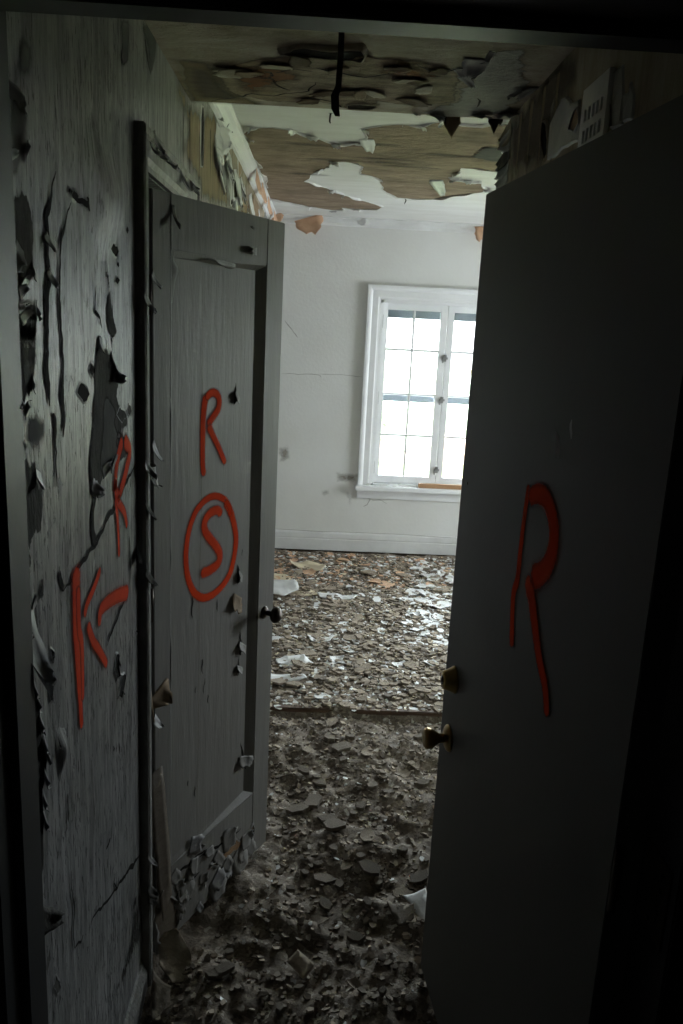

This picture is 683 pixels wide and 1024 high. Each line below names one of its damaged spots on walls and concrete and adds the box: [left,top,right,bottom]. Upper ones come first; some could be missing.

peeling [9,80,32,175]
spalling [211,50,539,230]
peeling [547,96,581,160]
peeling [14,190,43,427]
peeling [76,224,132,498]
peeling [23,441,46,570]
peeling [147,822,257,955]